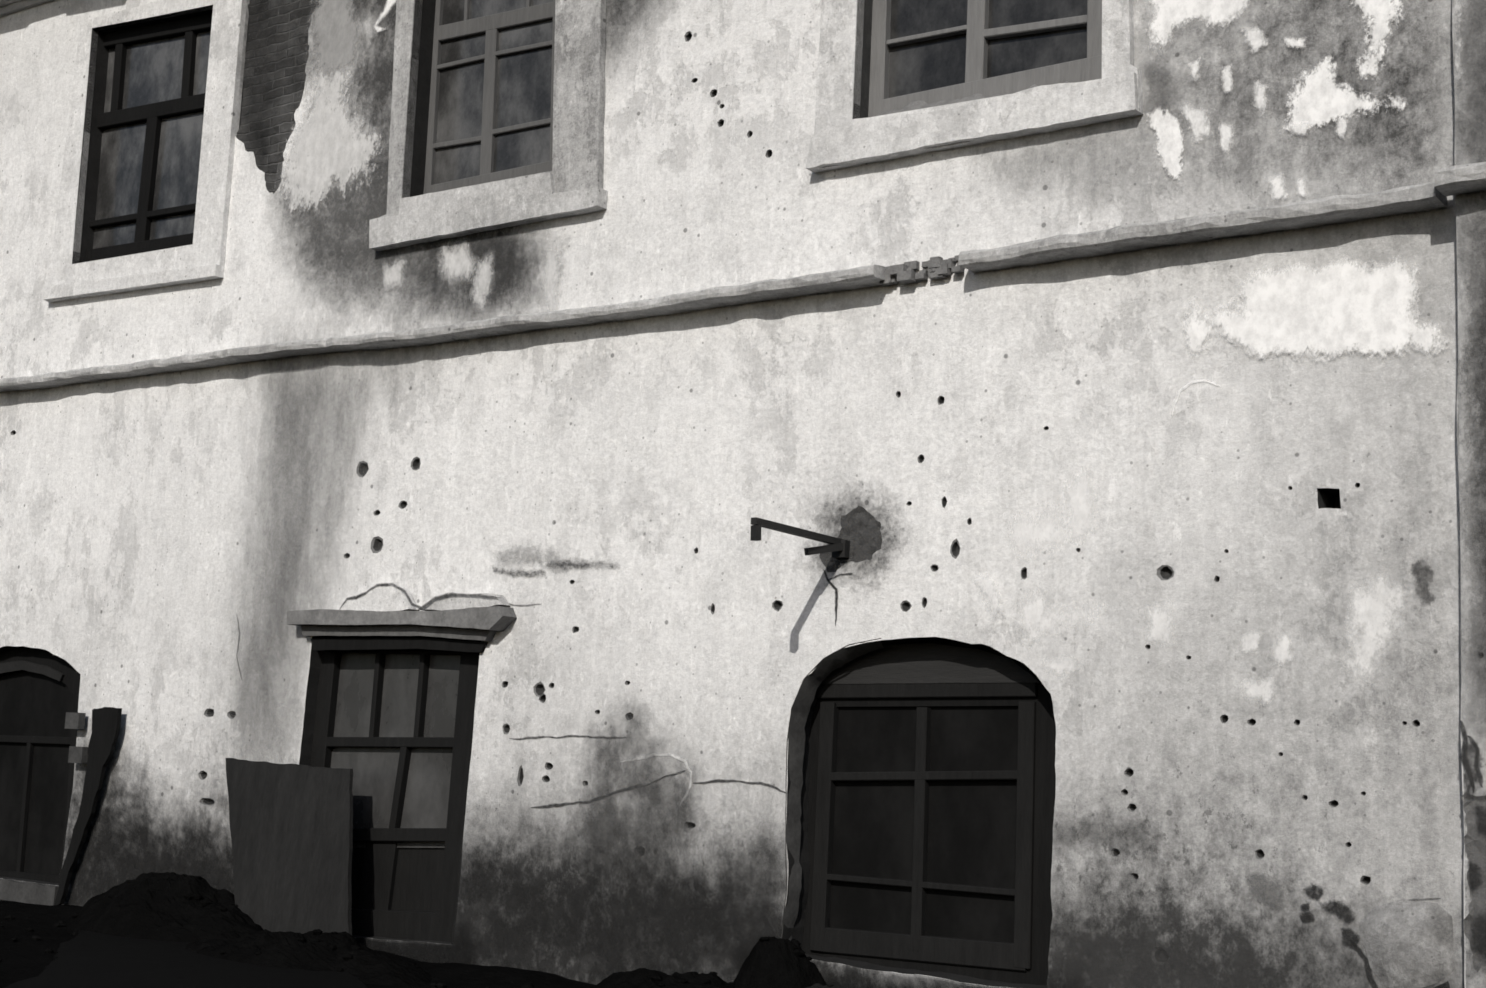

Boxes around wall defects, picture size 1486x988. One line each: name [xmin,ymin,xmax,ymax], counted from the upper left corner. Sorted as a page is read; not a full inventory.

spalling [236,0,381,213]
water stain [284,0,560,311]
peeling [1283,0,1406,131]
peeling [1183,257,1484,693]
crack [339,551,613,610]
crack [823,569,853,626]
crack [509,733,626,741]
water stain [355,717,782,985]
crack [531,770,786,808]
spalling [1461,782,1486,977]
water stain [822,967,1006,988]
water stain [1051,914,1305,988]